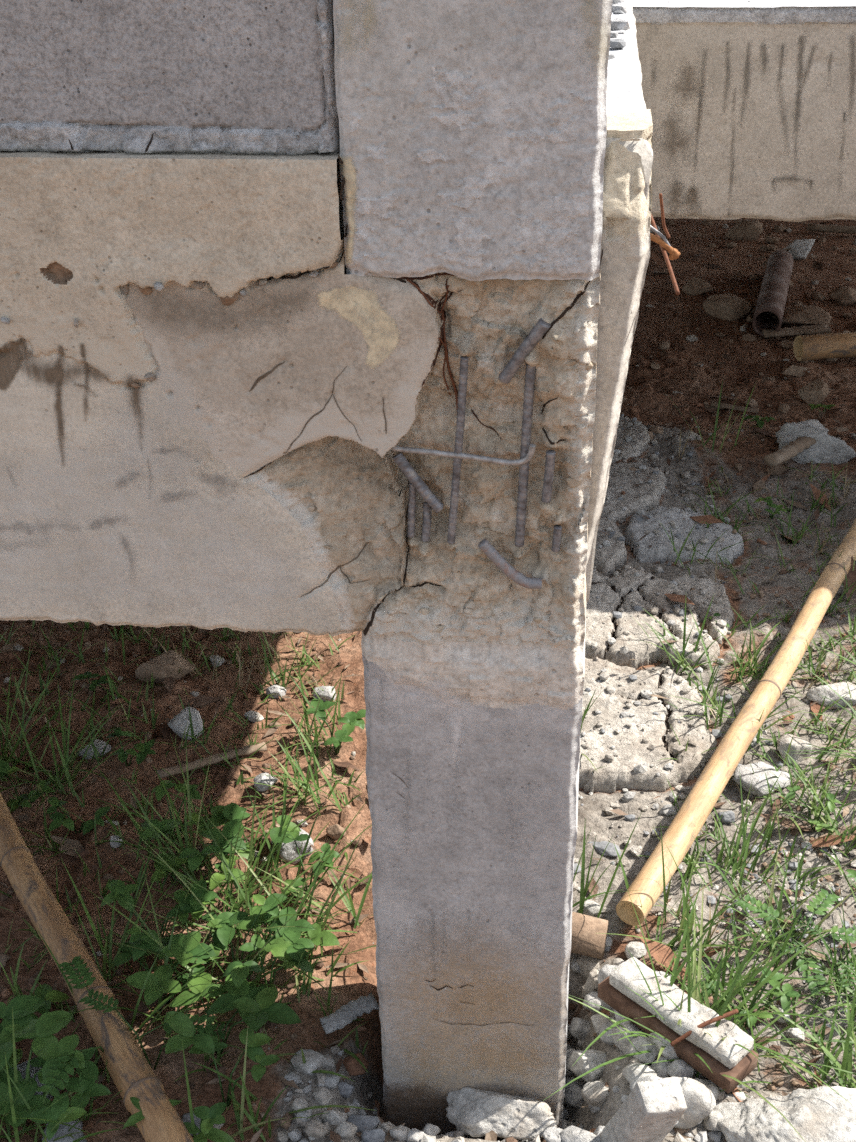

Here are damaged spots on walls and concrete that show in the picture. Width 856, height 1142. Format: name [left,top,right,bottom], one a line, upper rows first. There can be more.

water stain [745,45,766,93]
water stain [784,38,815,121]
crack [0,139,115,153]
crack [267,152,348,281]
water stain [671,183,697,208]
spalling [40,262,73,285]
water stain [0,339,106,449]
water stain [127,378,140,414]
crack [249,361,285,392]
crack [244,366,387,478]
spalling [119,244,601,652]
crack [301,461,441,635]